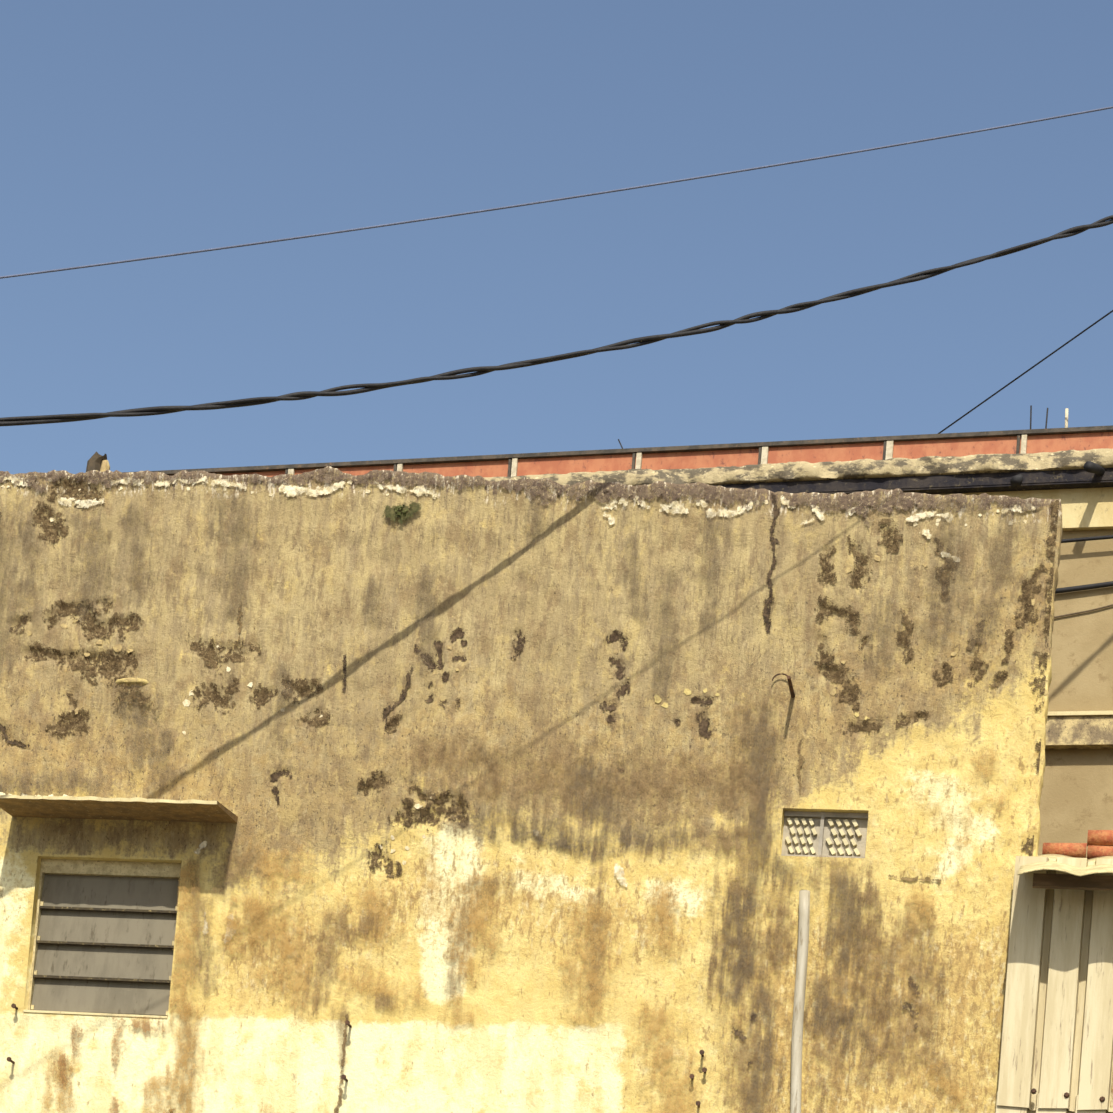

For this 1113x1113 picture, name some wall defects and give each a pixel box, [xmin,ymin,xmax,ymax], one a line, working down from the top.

peeling [602,495,759,525]
spalling [9,598,144,689]
spalling [183,633,331,728]
spalling [414,627,468,708]
spalling [599,629,630,724]
crack [762,493,783,633]
spalling [814,511,982,736]
spalling [933,499,1059,712]
spalling [357,769,392,795]
spalling [368,781,470,886]
leakage [476,695,793,1113]
leakage [809,856,951,1112]